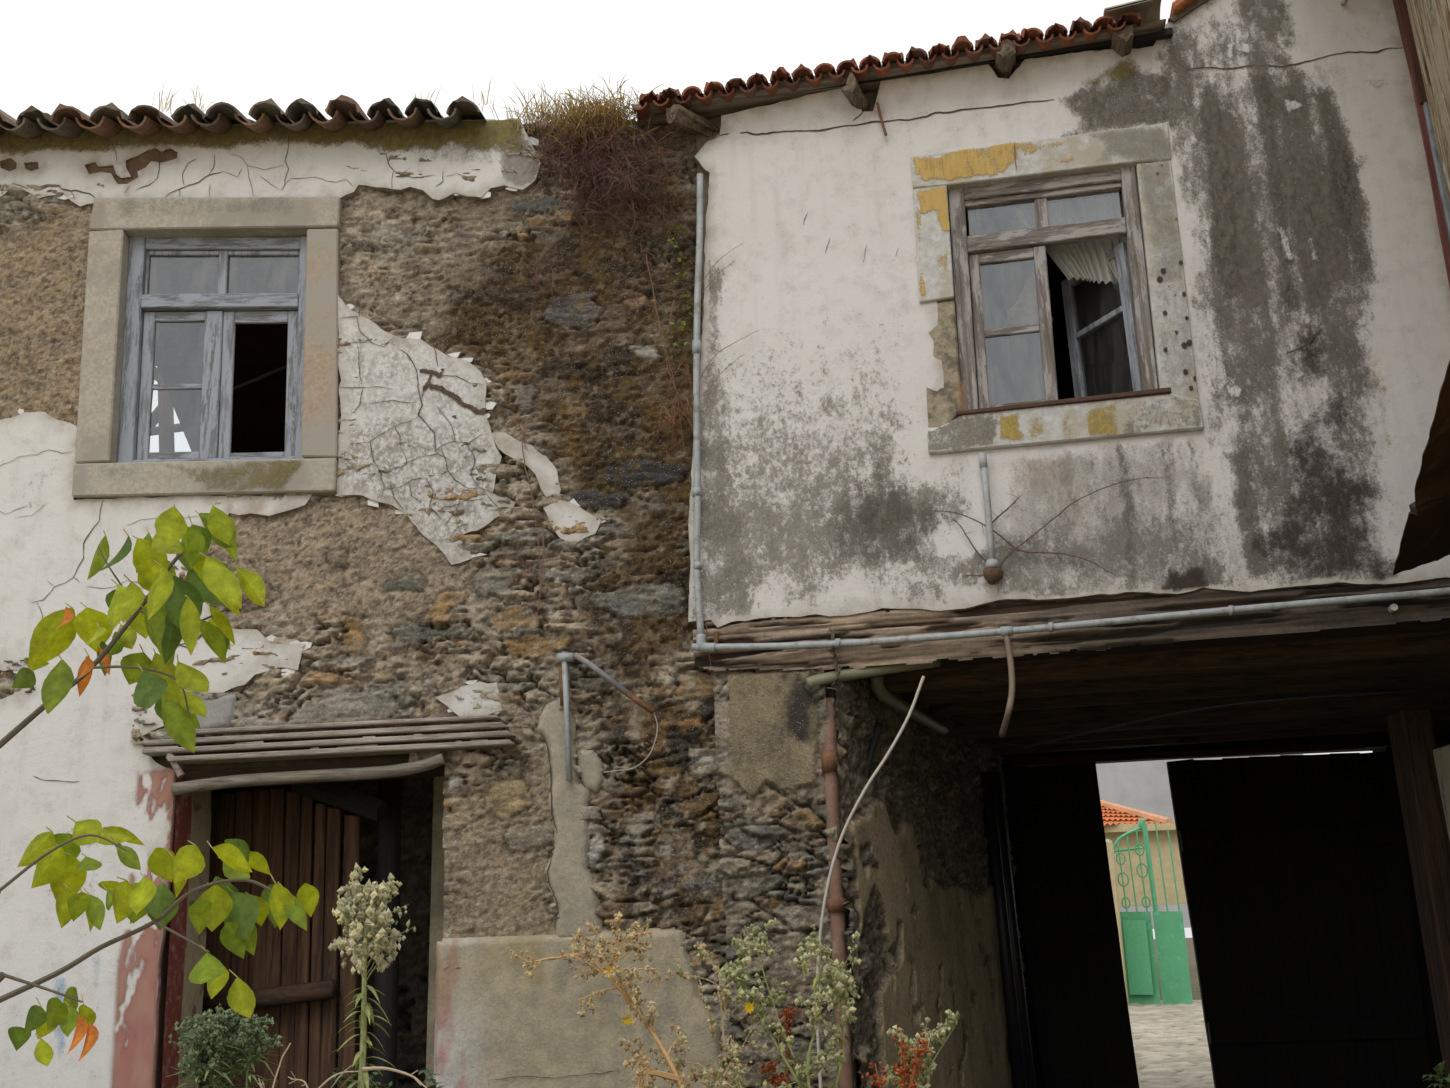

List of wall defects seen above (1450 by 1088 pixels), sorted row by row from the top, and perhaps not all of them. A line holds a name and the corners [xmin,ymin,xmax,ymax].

crack [712,72,1054,140]
flaking render [86,150,178,188]
crack [0,141,352,200]
peeling [913,141,1073,239]
peeling [0,159,93,426]
leakage [1061,0,1396,591]
crack [339,309,499,534]
leakage [928,415,998,451]
crack [32,502,196,618]
peeling [191,122,1028,1088]
leakage [830,459,948,561]
peeling [0,659,35,700]